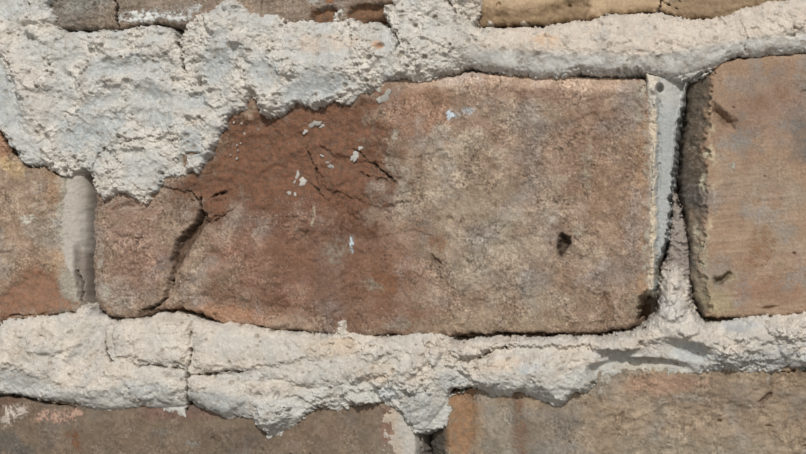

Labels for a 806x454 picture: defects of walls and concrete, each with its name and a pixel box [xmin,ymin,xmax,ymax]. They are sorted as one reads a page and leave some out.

crack [356,150,395,182]